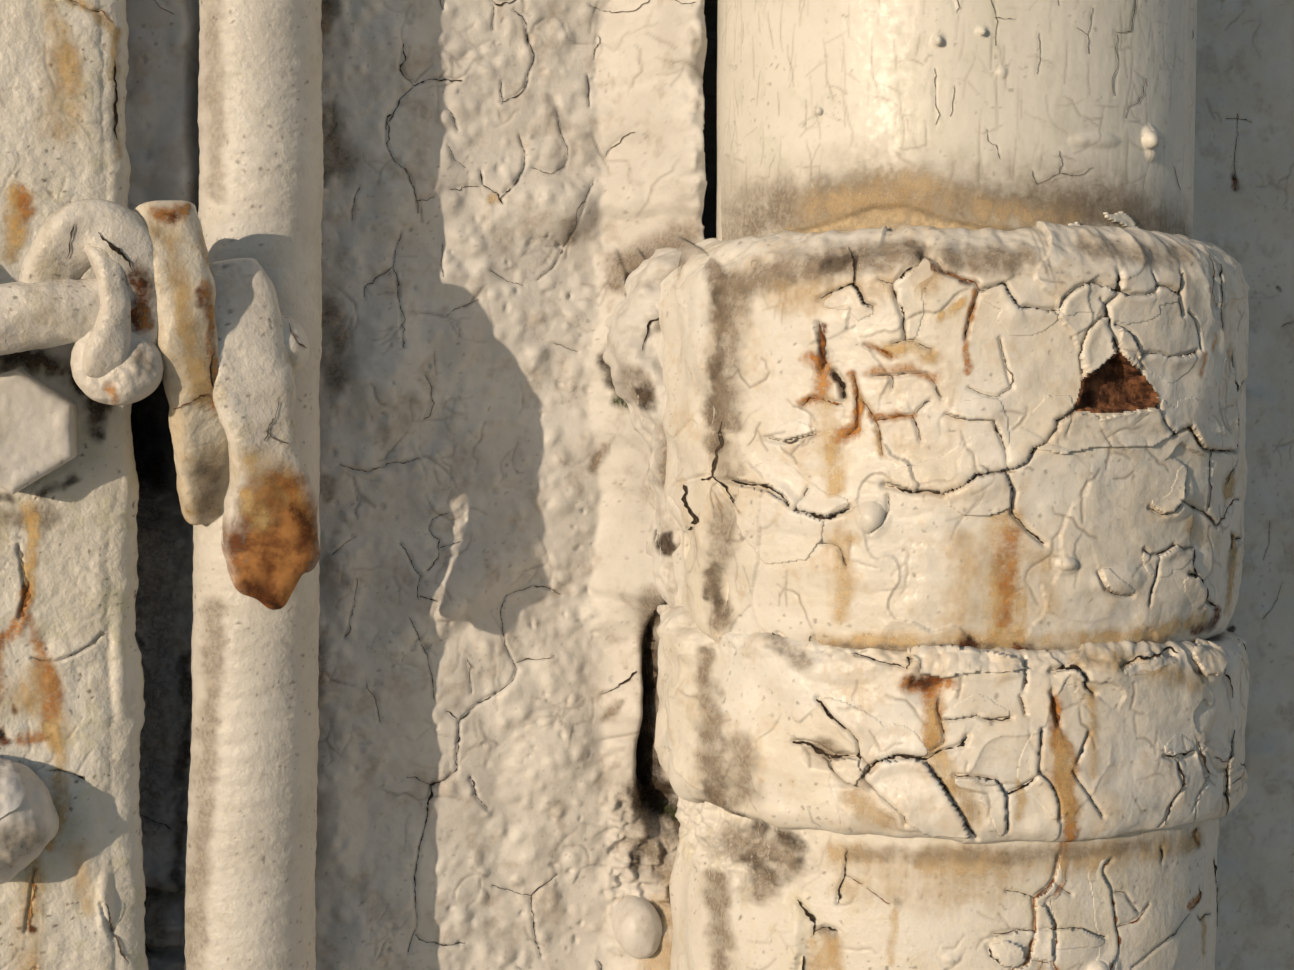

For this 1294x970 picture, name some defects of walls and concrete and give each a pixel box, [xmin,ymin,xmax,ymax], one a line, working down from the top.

rust [923,257,977,321]
rust [798,324,914,494]
crack [681,247,1270,611]
spalling [1037,317,1173,454]
rust [223,455,320,610]
rust [0,505,67,827]
crack [402,513,560,952]
crack [606,600,666,701]
crack [797,850,890,970]
crack [793,661,1103,837]
rust [1050,696,1078,862]
crack [988,730,1246,970]